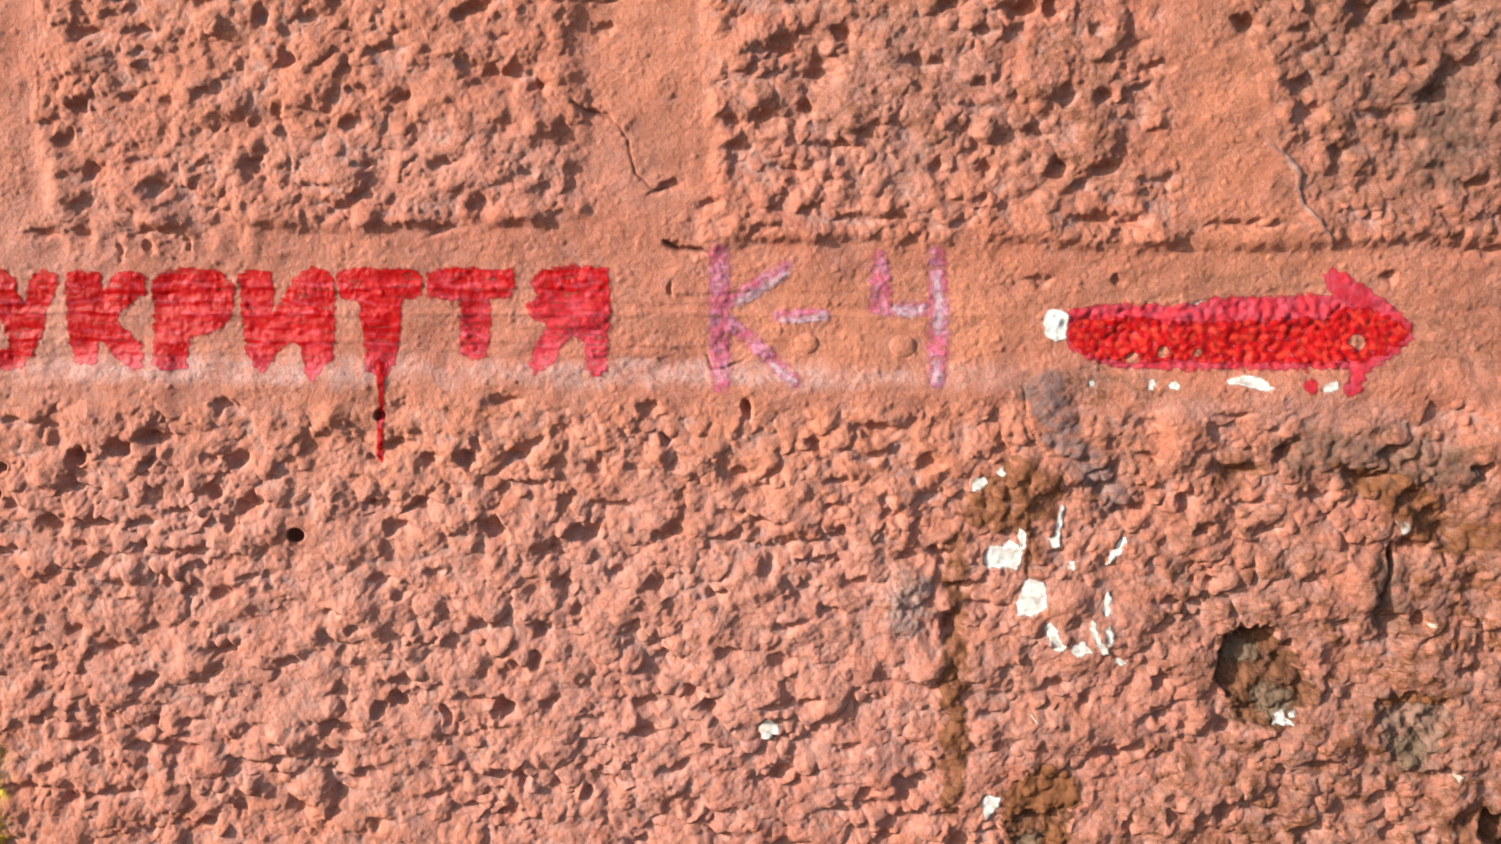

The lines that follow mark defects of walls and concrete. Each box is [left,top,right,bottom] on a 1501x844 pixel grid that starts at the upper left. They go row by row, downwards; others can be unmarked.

crack [1269,143,1333,247]
flaking render [1214,625,1319,731]
flaking render [1376,691,1455,779]
flaking render [982,764,1080,844]